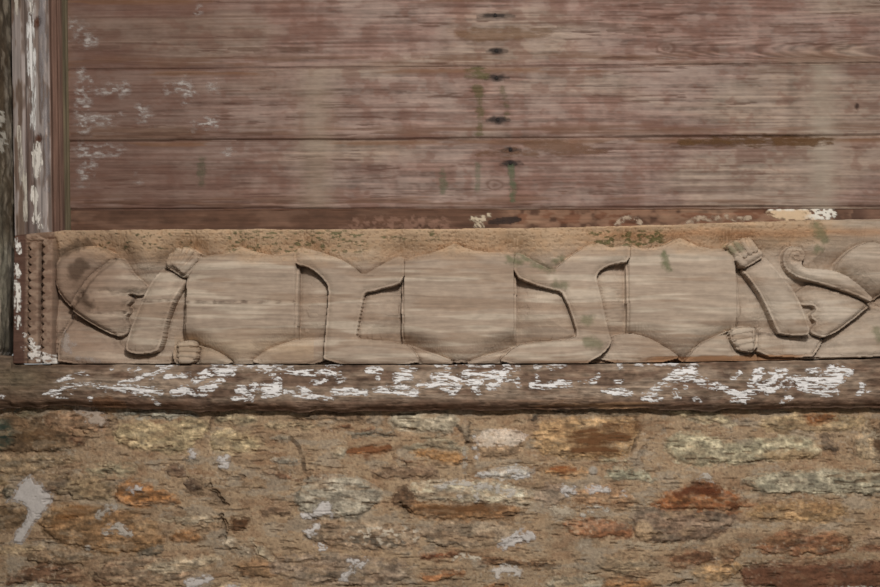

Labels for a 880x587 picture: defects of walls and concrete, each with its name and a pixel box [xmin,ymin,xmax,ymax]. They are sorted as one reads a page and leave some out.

peeling [14,239,79,364]
peeling [42,364,572,406]
peeling [584,363,854,404]